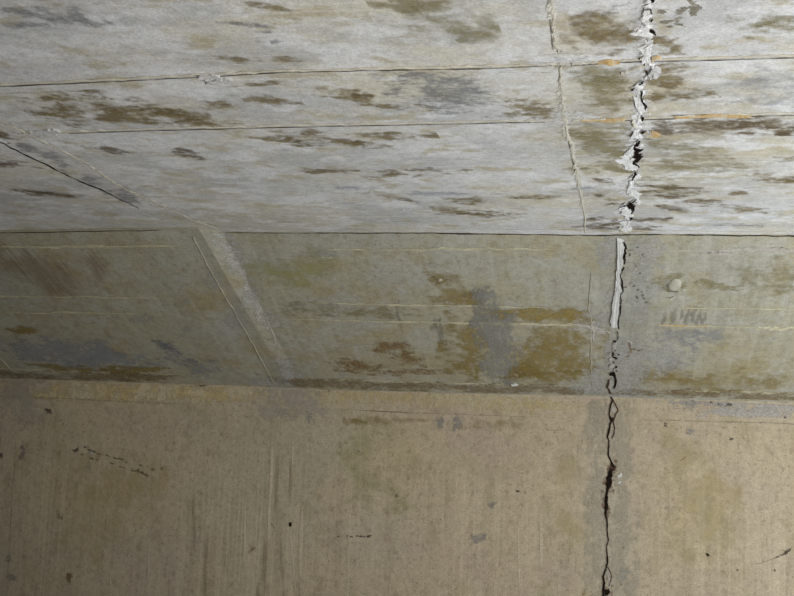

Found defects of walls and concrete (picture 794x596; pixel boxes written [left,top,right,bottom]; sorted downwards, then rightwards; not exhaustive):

water stain [373,0,445,23]
water stain [33,90,232,130]
water stain [244,97,302,105]
water stain [335,72,488,113]
water stain [506,99,552,119]
water stain [568,0,794,231]
water stain [250,129,402,147]
water stain [388,192,494,218]
crack [686,230,794,238]
crack [303,0,667,596]
water stain [0,326,269,406]
water stain [287,287,599,414]